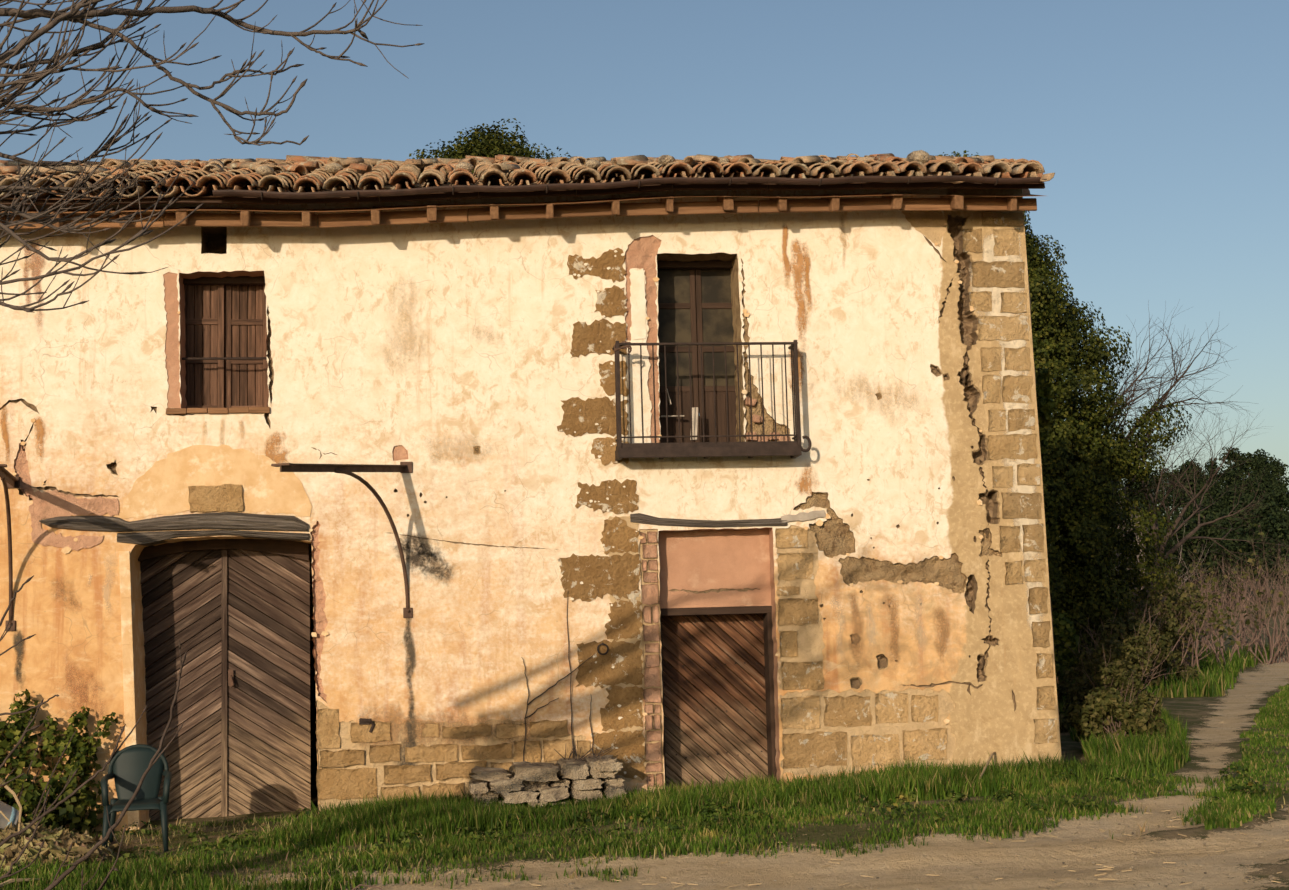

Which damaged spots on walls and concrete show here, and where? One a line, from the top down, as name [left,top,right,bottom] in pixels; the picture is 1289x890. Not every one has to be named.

flaking render [741,259,790,442]
crack [0,398,39,446]
flaking render [13,440,119,554]
leakage [395,535,451,579]
flaking render [309,235,664,811]
crack [903,213,1017,711]
spalling [973,489,1002,557]
flaking render [775,492,978,776]
spalling [969,635,1000,682]